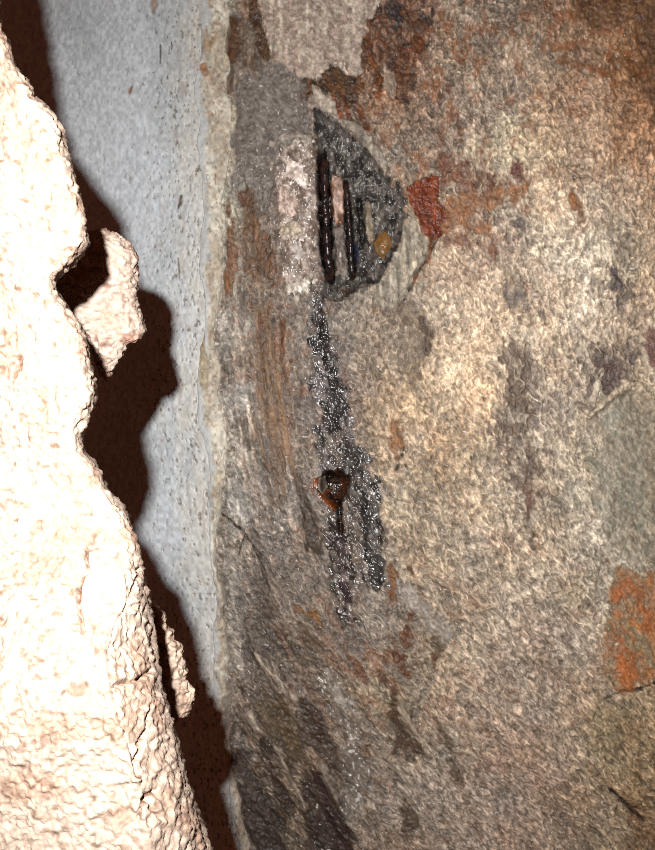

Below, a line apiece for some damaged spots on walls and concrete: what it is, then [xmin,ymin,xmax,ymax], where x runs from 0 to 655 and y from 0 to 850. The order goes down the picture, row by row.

spalling [230,0,428,310]
corrosion [407,151,528,264]
damp [305,279,391,623]
corrosion [601,566,655,693]